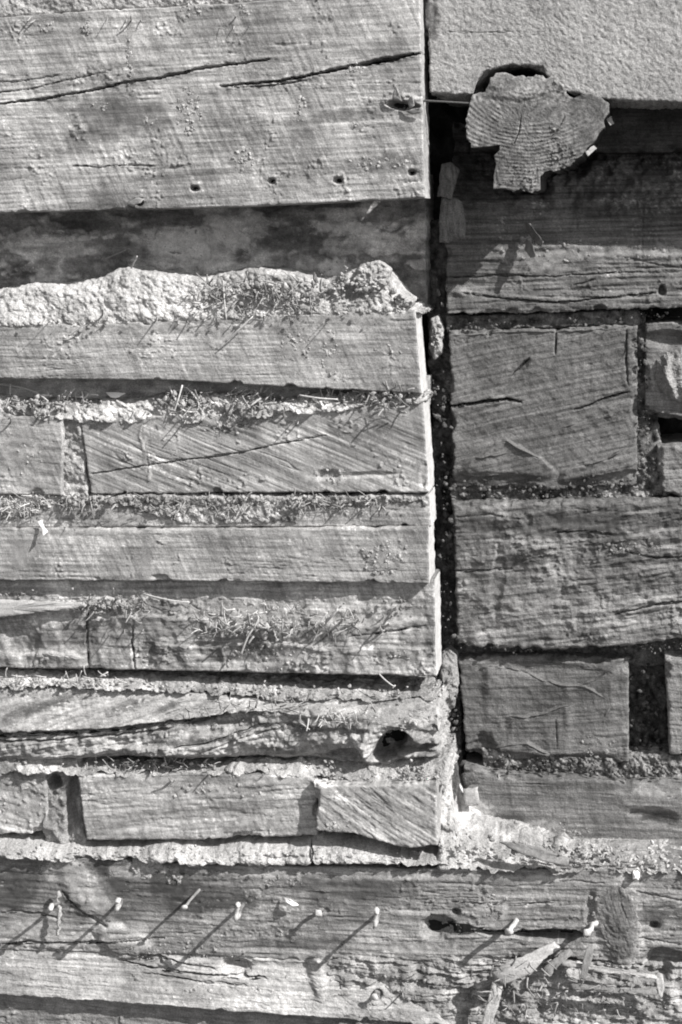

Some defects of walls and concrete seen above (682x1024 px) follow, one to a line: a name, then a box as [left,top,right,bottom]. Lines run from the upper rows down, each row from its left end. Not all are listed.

crack [0,52,421,104]
crack [90,437,316,474]
crack [0,715,267,748]